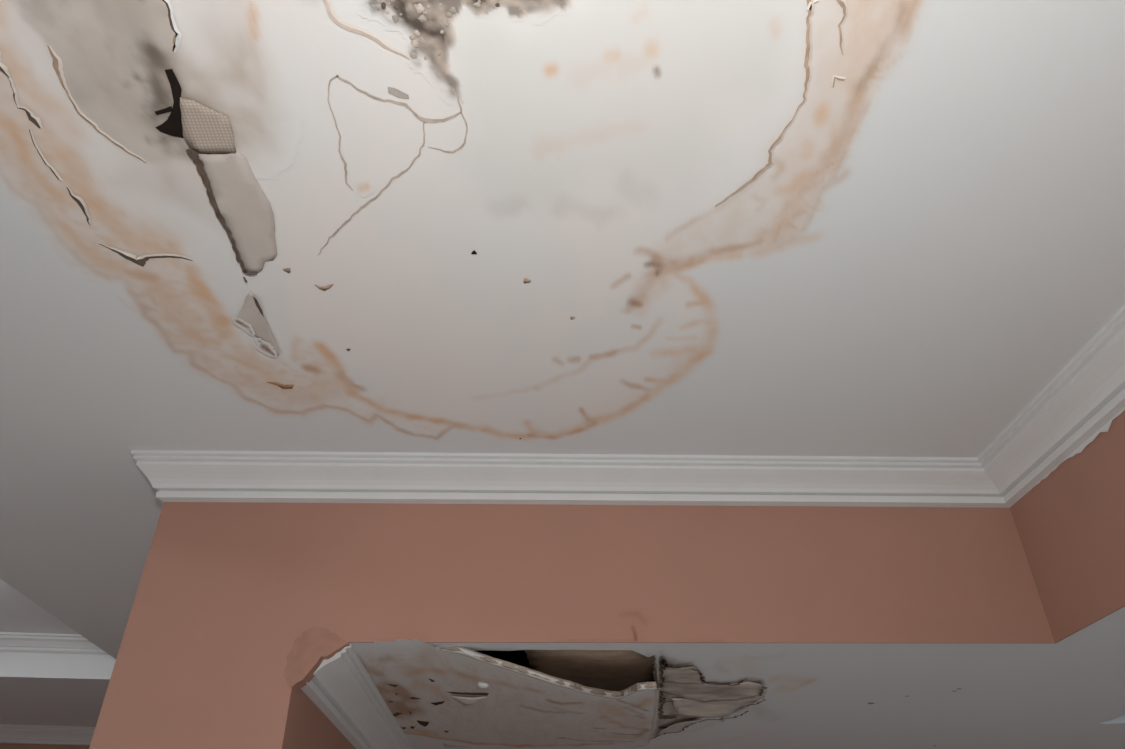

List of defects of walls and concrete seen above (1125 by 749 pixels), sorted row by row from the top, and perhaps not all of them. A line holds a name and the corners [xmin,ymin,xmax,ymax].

crack [0,45,193,267]
peeling [0,0,306,273]
peeling [232,291,279,357]
crack [323,0,411,60]
crack [318,75,468,255]
water stain [0,0,943,449]
crack [715,0,848,207]
peeling [651,648,771,740]